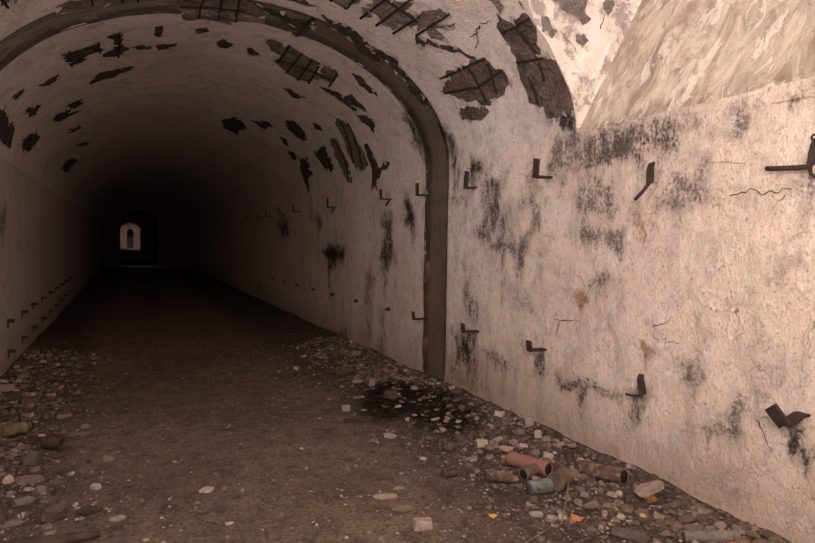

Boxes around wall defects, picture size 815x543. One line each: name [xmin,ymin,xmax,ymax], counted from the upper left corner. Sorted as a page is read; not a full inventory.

spalling [34,74,59,88]
spalling [53,0,147,14]
spalling [60,26,177,86]
spalling [175,0,432,135]
spalling [329,0,575,123]
flaking render [554,0,591,47]
spalling [0,104,42,156]
spalling [51,99,92,176]
spalling [280,117,390,194]
water stain [438,124,459,188]
water stain [469,159,540,277]
water stain [546,108,685,252]